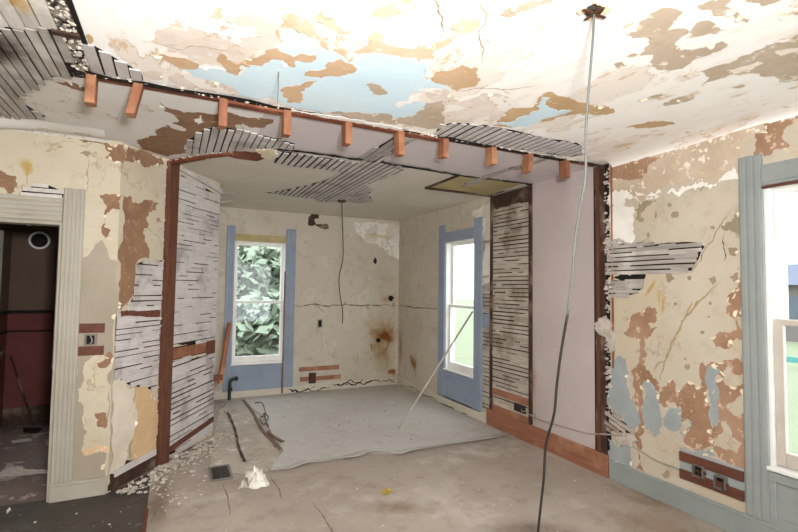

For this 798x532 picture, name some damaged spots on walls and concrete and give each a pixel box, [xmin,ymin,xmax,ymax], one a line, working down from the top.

peeling [57,82,85,92]
peeling [142,10,615,130]
crack [435,0,457,36]
crack [478,0,497,62]
peeling [639,94,694,106]
peeling [614,0,750,78]
peeling [701,34,798,89]
peeling [69,104,274,167]
peeling [0,170,17,194]
peeling [700,268,742,349]
peeling [72,194,161,491]
peeling [607,306,745,472]